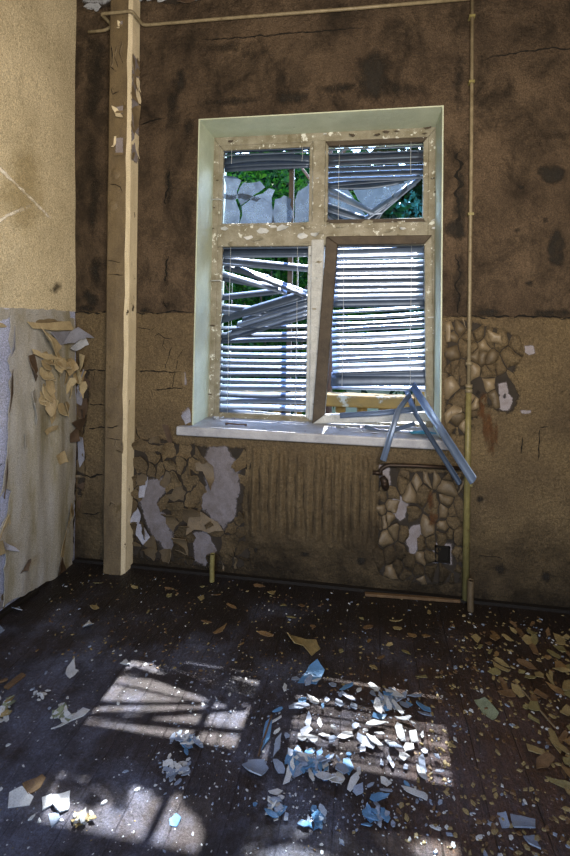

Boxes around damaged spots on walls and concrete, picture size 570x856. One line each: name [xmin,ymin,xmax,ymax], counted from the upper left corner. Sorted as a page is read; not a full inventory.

peeling [83,0,110,11]
peeling [111,55,141,163]
crack [482,46,570,60]
water stain [445,174,465,238]
water stain [538,166,565,183]
crack [135,256,194,397]
peeling [433,318,535,438]
peeling [0,307,94,610]
peeling [130,424,251,571]
peeling [372,463,464,586]